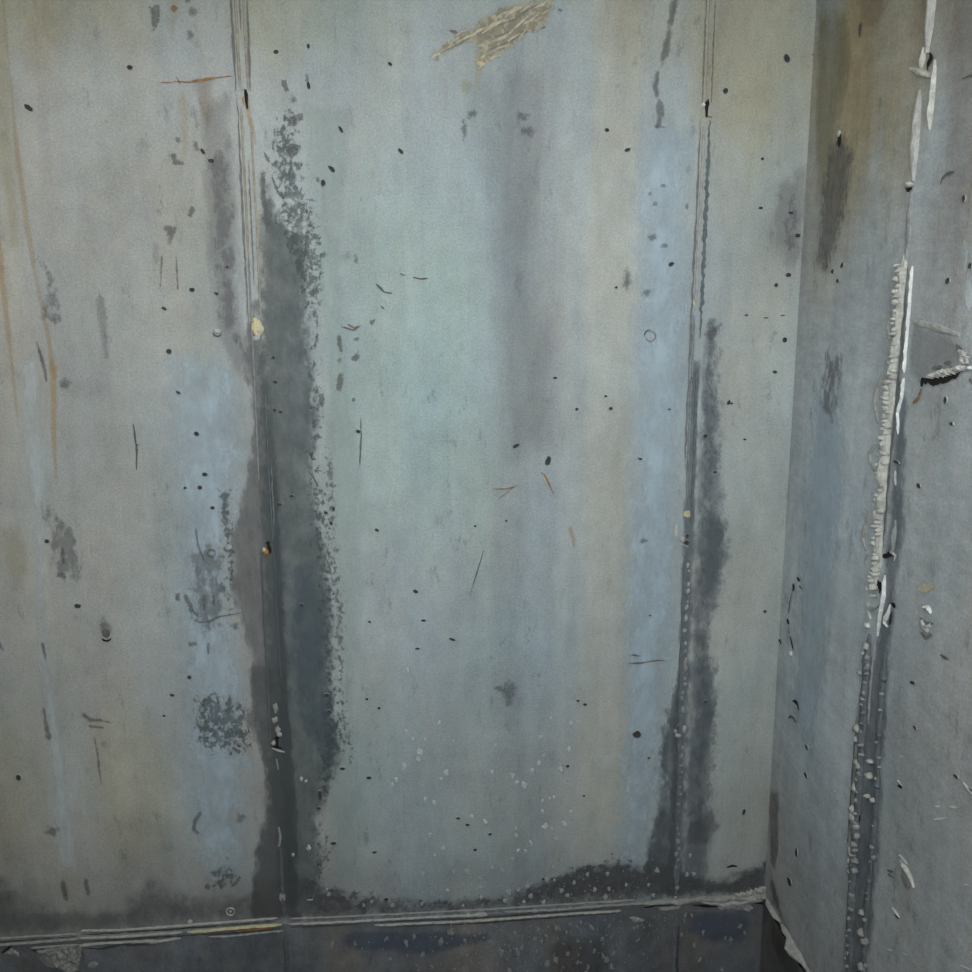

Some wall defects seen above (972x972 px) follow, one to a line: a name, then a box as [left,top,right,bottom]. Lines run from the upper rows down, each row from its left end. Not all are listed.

spalling [430,0,562,69]
spalling [913,320,972,404]
water stain [286,145,779,919]
water stain [176,368,283,860]
spalling [32,946,98,972]